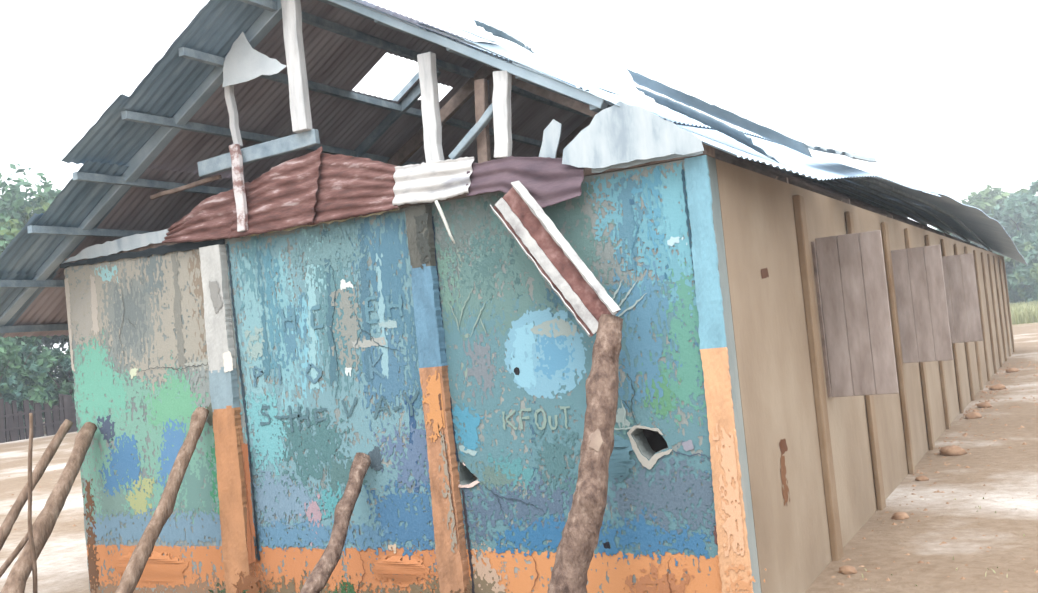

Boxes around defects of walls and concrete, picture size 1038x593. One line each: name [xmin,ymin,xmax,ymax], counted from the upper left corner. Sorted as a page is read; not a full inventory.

corrosion [162,146,399,243]
corrosion [466,156,584,208]
crack [119,279,208,372]
peeling [64,193,596,593]
crack [432,216,446,353]
peeling [542,162,745,559]
crack [441,389,540,593]
corrosion [780,453,790,506]